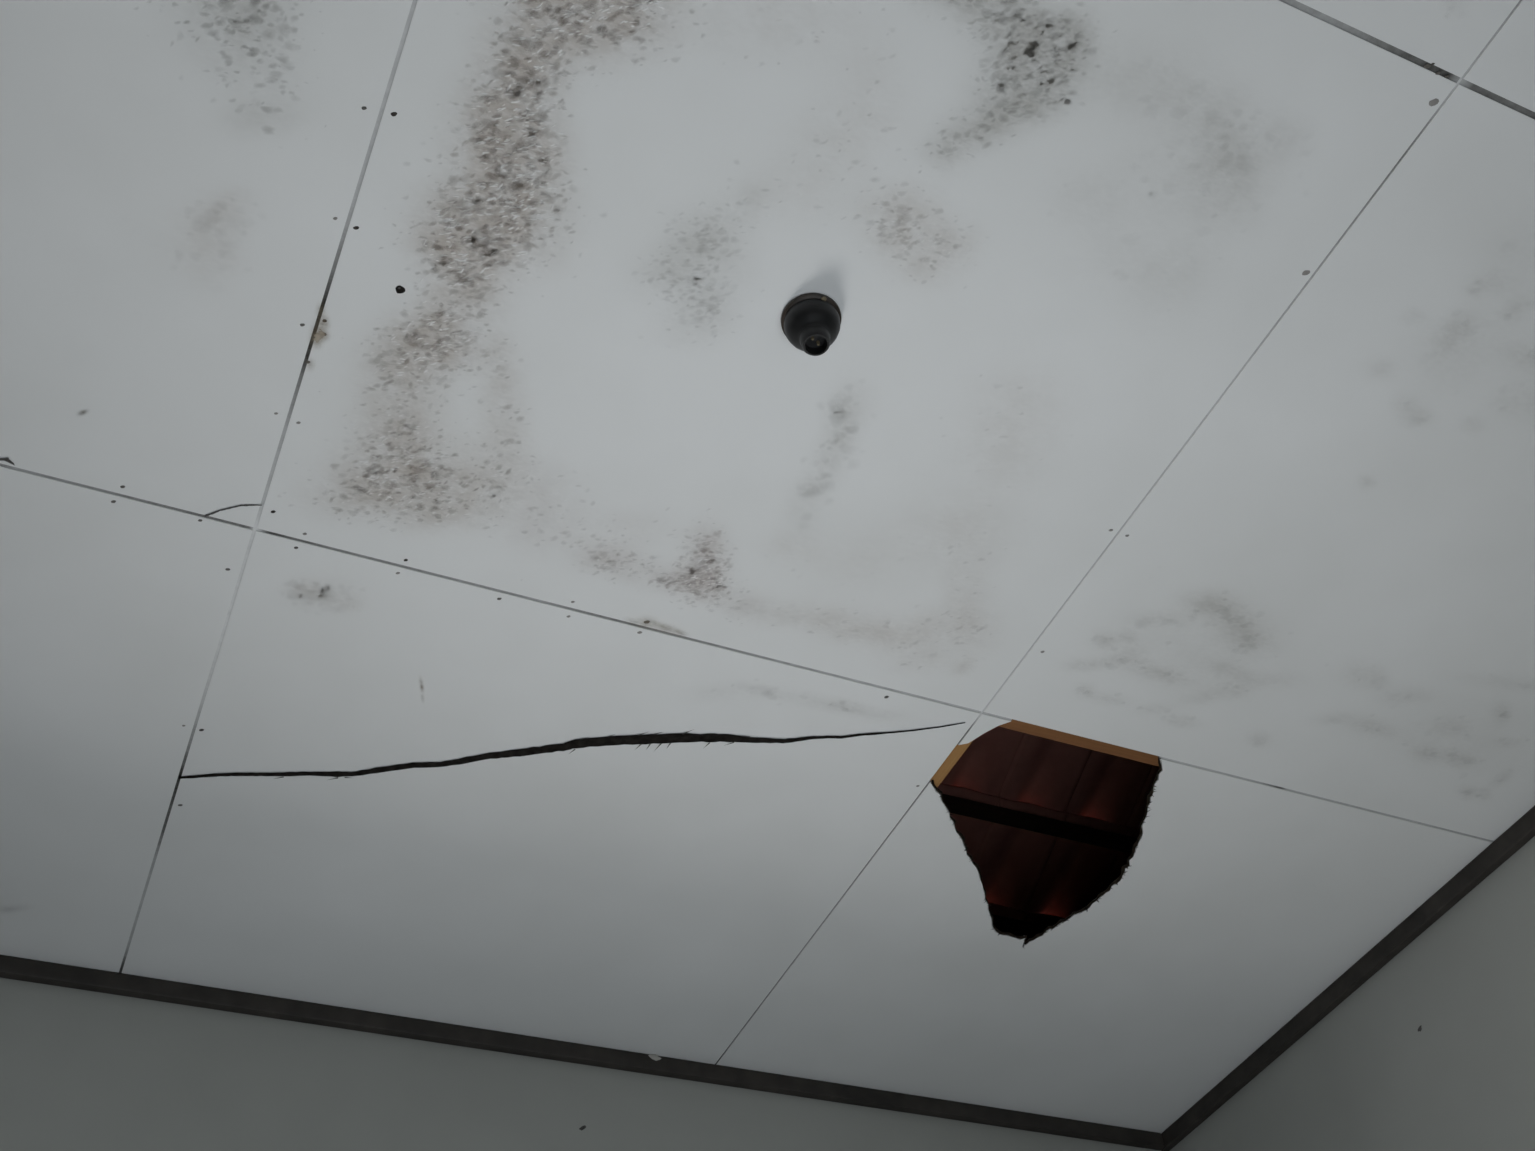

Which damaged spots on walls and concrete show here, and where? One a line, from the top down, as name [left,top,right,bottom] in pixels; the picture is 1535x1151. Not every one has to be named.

water stain [305,0,672,525]
crack [178,722,965,780]
spalling [931,756,1163,948]